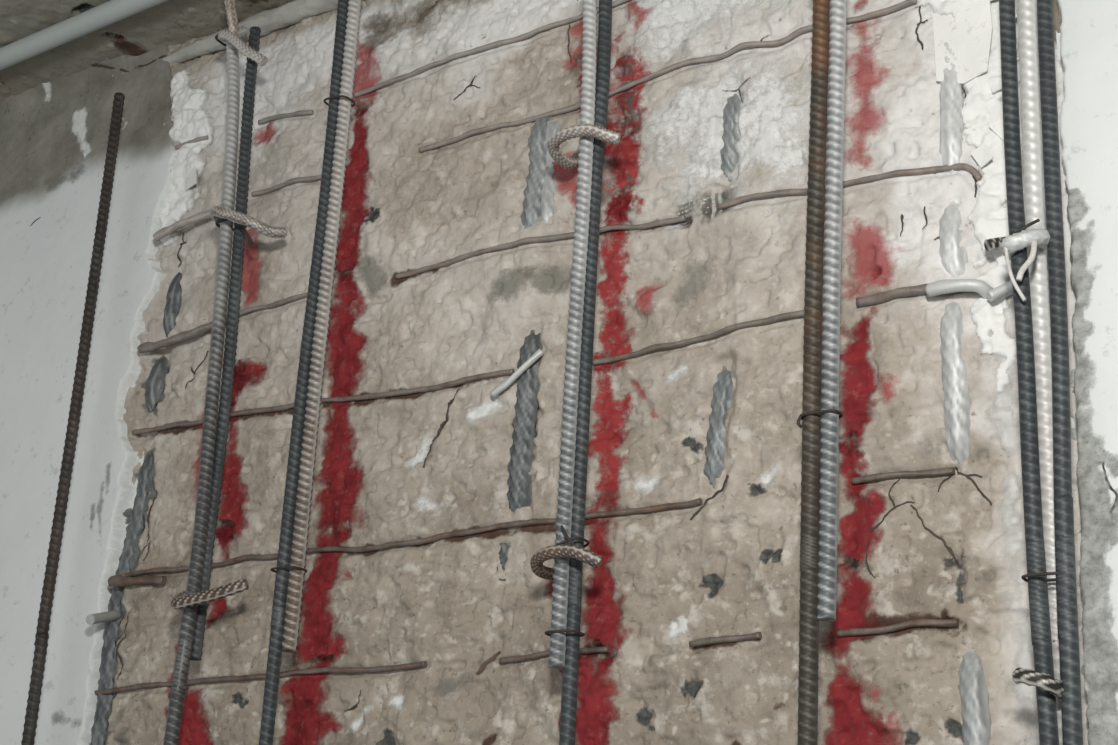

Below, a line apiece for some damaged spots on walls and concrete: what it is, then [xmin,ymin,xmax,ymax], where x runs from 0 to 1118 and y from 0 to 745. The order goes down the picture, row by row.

spalling [21,72,128,745]
spalling [98,218,234,690]
spalling [89,605,265,745]
spalling [160,0,349,680]
spalling [259,568,304,745]
crack [423,389,459,468]
spalling [280,0,1118,745]
crack [865,467,992,578]